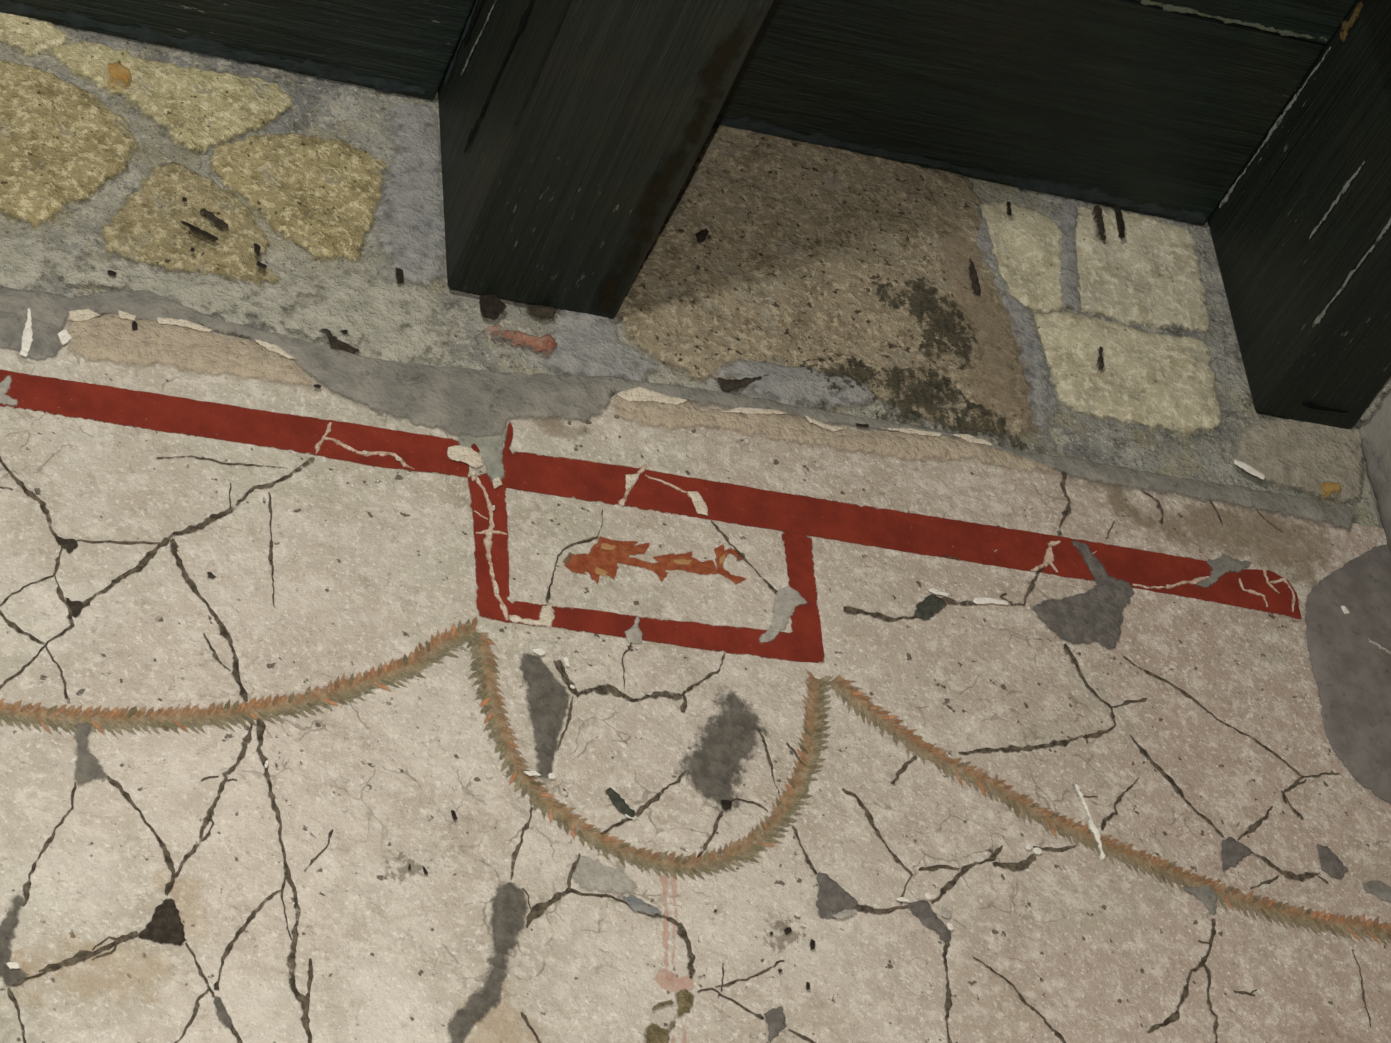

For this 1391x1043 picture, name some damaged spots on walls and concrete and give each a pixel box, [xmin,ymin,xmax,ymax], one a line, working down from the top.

peeling [20,308,33,357]
flaking render [58,308,322,388]
water stain [800,273,1028,450]
water stain [968,257,981,297]
crack [474,474,508,620]
crack [546,464,778,603]
crack [843,471,1071,622]
crack [0,422,411,1043]
crack [554,642,725,750]
crack [842,643,1340,914]
flaking render [139,899,186,946]
crack [510,770,816,1043]